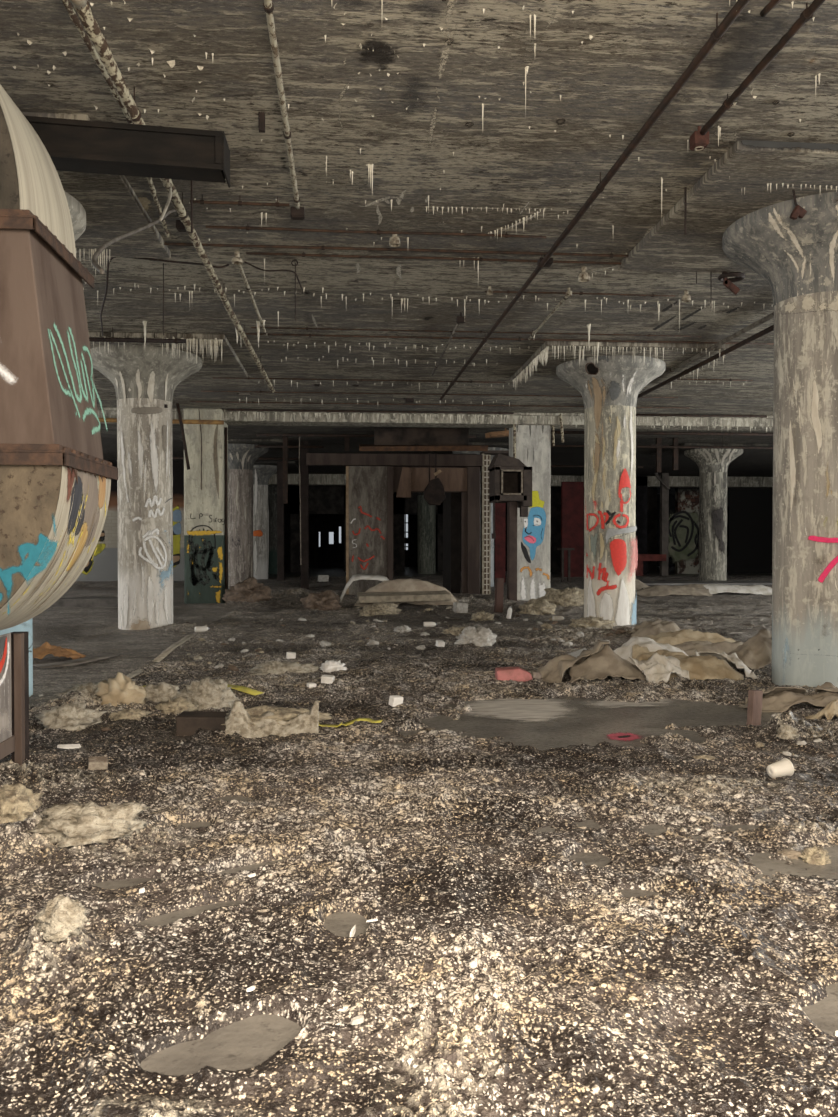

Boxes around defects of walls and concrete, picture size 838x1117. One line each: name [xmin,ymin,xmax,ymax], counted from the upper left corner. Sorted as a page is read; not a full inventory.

peeling [784,296,838,313]
water stain [595,355,636,400]
spalling [131,407,167,451]